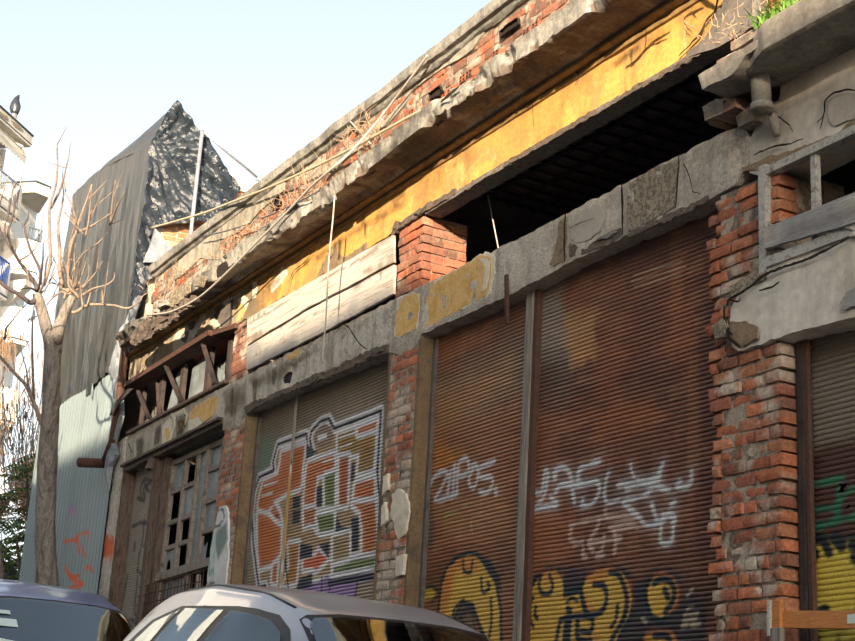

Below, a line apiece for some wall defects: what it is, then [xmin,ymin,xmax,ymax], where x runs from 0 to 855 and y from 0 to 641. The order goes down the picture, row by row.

crack [678,0,718,56]
flaking render [745,0,767,25]
spalling [391,0,732,235]
crack [754,88,855,155]
peeling [244,251,495,413]
spalling [712,318,759,347]
peeling [161,395,219,444]
flaking render [381,473,411,540]
flaking render [395,554,407,577]